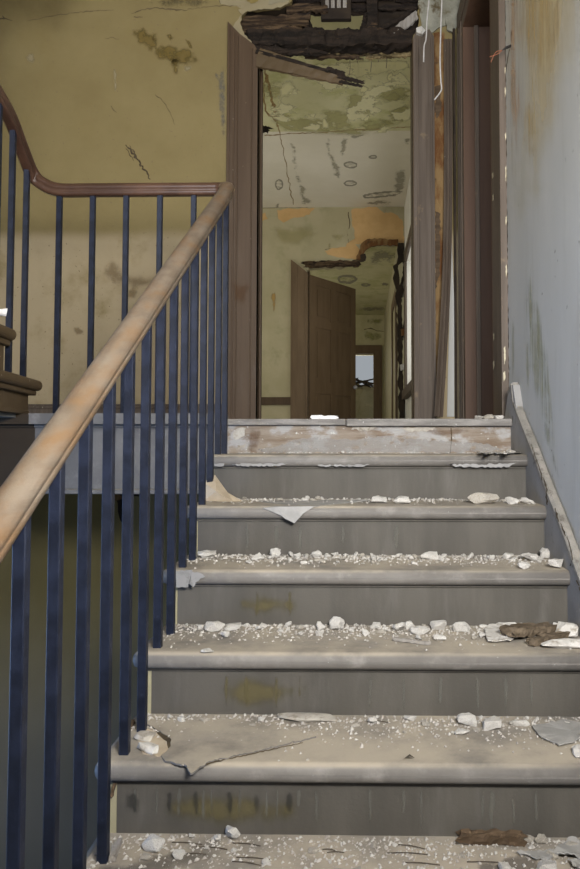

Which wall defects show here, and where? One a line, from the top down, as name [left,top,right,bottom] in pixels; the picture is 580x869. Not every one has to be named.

water stain [134,29,196,73]
spalling [233,0,460,133]
crack [126,145,150,179]
crack [263,70,406,208]
flaking render [325,207,404,262]